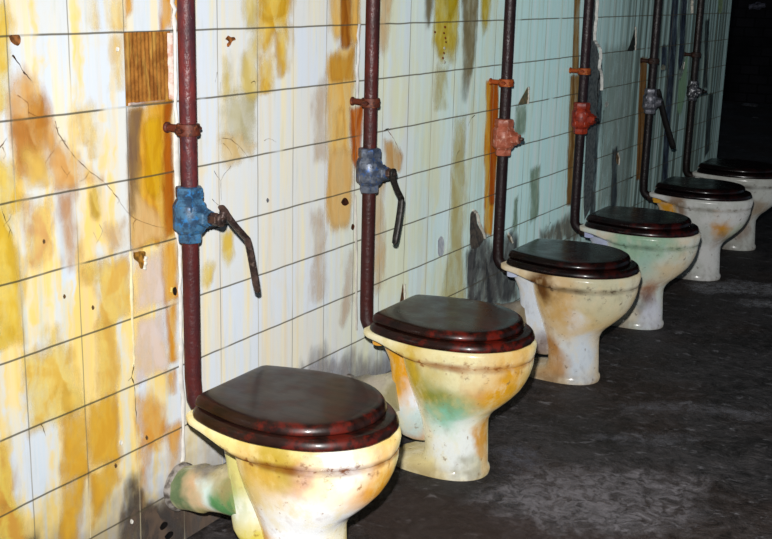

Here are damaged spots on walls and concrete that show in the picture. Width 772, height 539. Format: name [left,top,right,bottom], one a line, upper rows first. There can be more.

leakage [0,76,78,349]
crack [45,121,162,228]
spalling [133,251,148,270]
rust [327,0,363,226]
peeling [470,209,486,249]
leakage [445,127,517,304]
rust [484,81,498,236]
spalling [519,87,530,105]
peeling [584,0,608,220]
leakage [24,258,130,539]
leakage [138,400,181,455]
leakage [121,479,225,539]